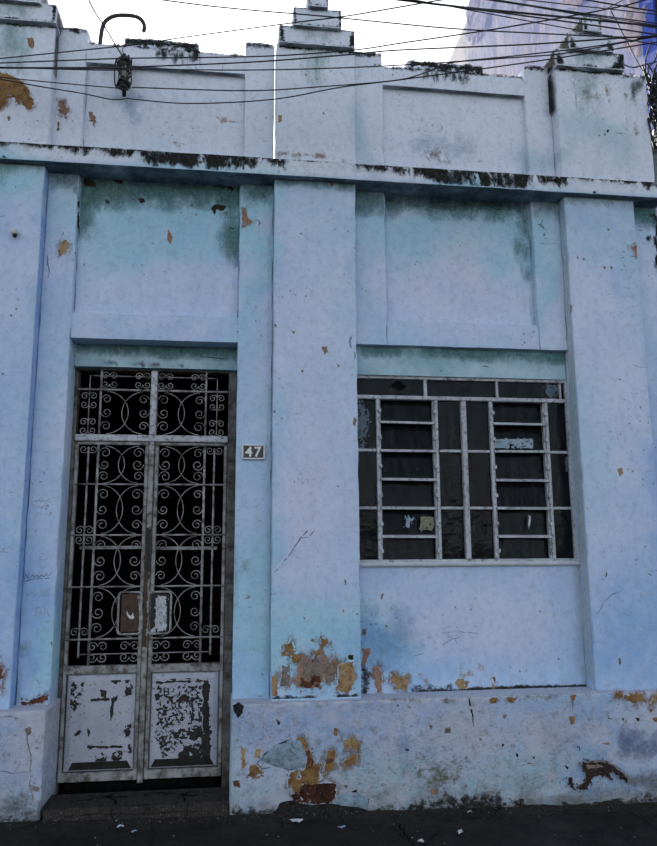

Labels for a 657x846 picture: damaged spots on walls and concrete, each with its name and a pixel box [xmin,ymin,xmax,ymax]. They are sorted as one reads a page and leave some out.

leakage [89,37,239,77]
leakage [210,0,380,72]
leakage [385,17,645,114]
spalling [0,71,38,121]
leakage [0,141,657,268]
spalling [272,636,411,696]
peeling [70,680,133,721]
peeling [74,723,132,762]
peeling [154,678,212,759]
spalling [284,728,362,805]
spalling [565,757,628,793]
spalling [613,690,657,722]